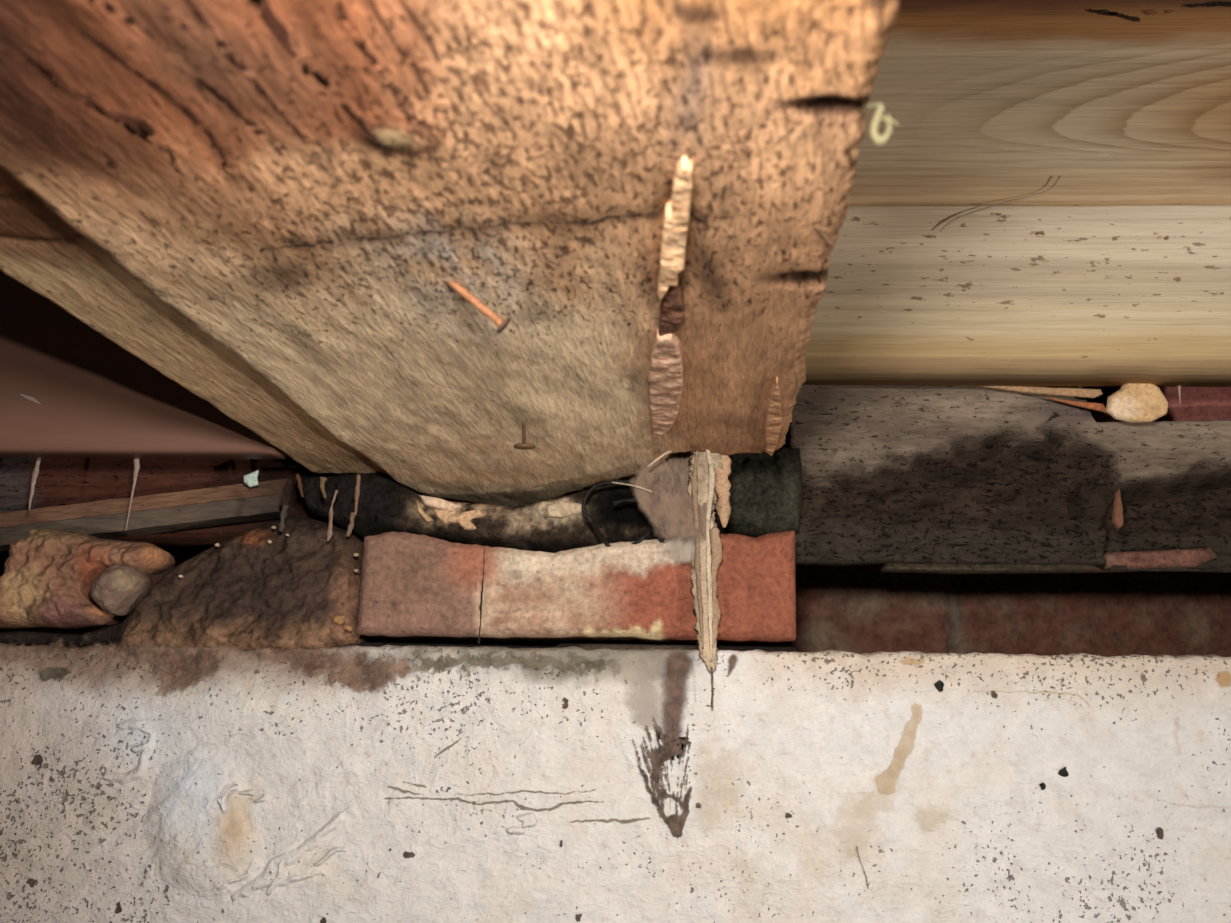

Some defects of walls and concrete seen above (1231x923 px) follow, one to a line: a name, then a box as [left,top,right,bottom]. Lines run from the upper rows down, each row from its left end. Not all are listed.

crack [435,738,461,757]
damp [877,704,922,794]
crack [384,784,650,823]